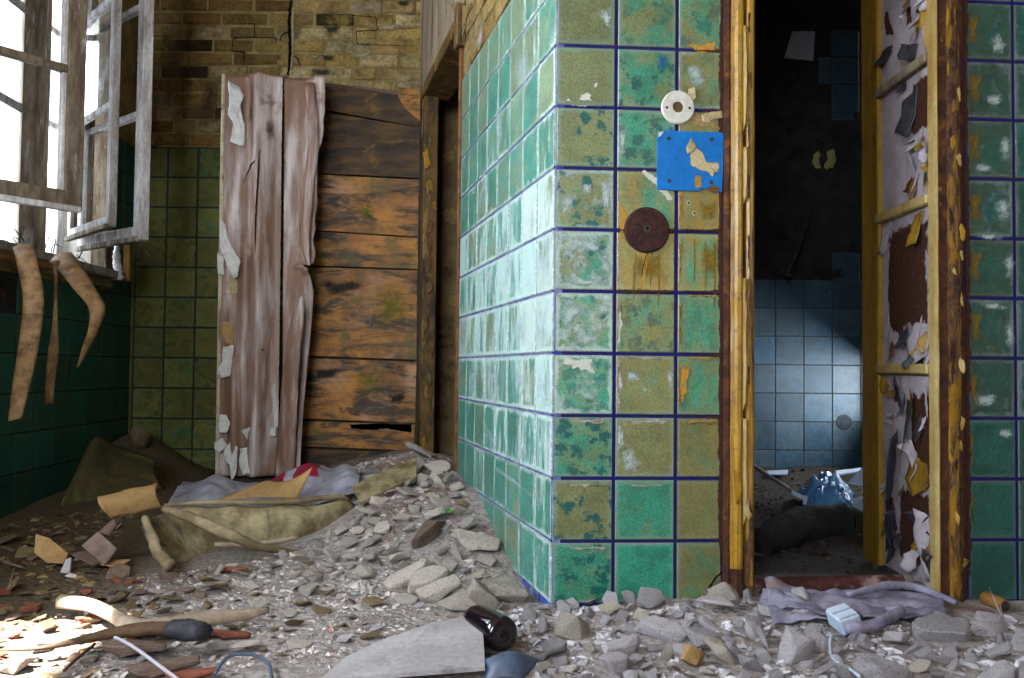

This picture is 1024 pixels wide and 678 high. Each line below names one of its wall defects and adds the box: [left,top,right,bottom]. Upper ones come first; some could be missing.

crack [231,0,301,76]
peeling [872,0,927,66]
peeling [894,76,942,206]
peeling [950,134,962,167]
peeling [952,224,966,275]
corrosion [619,0,732,585]
corrosion [948,0,981,602]
peeling [949,416,965,464]